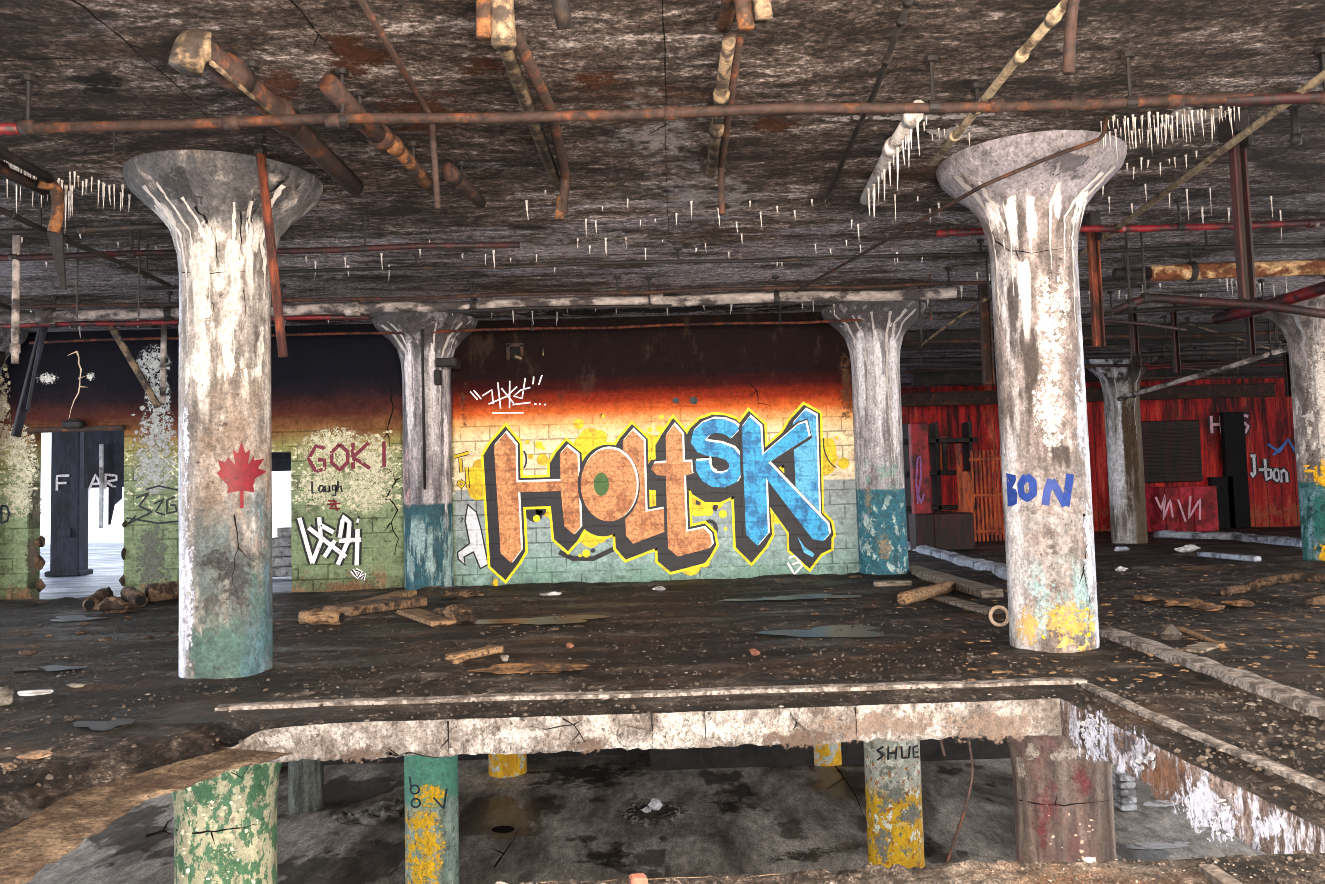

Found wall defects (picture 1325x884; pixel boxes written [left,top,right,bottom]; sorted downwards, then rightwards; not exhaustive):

corrosion [319,29,398,79]
corrosion [257,69,311,108]
corrosion [377,89,461,135]
water stain [922,113,997,156]
water stain [142,162,301,369]
water stain [954,148,1115,419]
water stain [503,304,804,318]
peeling [1301,336,1325,487]
water stain [1051,445,1070,467]
peeling [180,767,266,884]
peeling [409,784,448,882]
peeling [877,781,921,826]